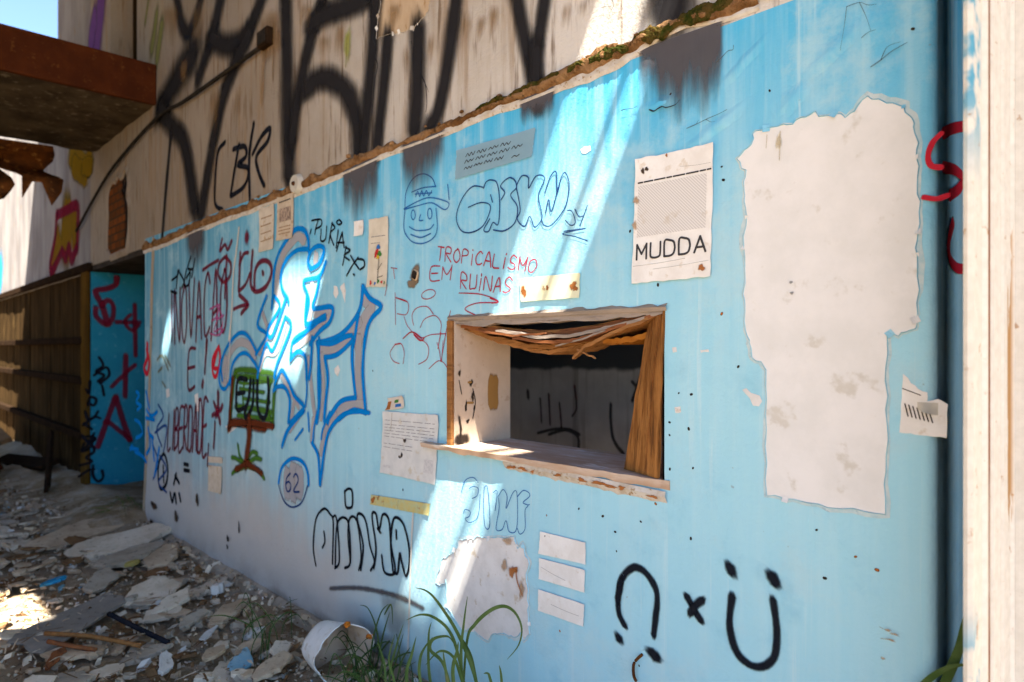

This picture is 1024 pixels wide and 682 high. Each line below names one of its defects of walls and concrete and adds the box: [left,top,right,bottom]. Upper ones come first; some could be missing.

peeling [375,0,431,40]
flaking render [106,164,132,261]
peeling [735,91,925,519]
peeling [435,534,532,643]